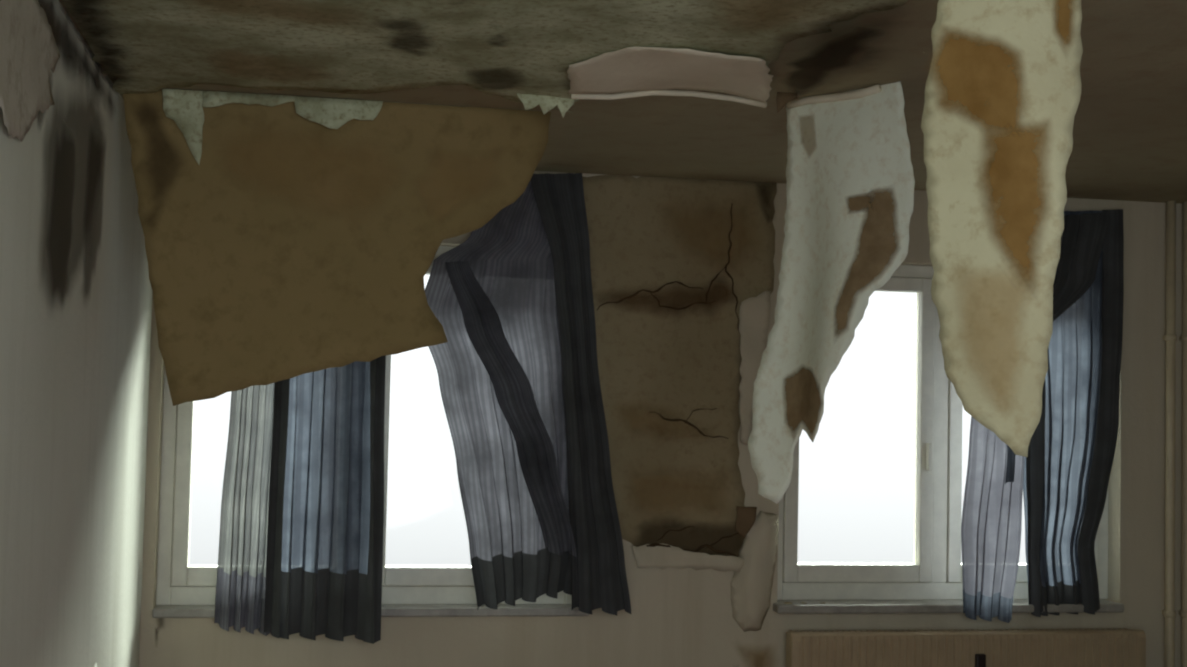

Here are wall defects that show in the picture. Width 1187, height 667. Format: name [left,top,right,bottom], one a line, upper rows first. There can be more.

peeling [0,0,60,142]
crack [597,203,740,333]
peeling [582,175,777,572]
peeling [921,0,1083,457]